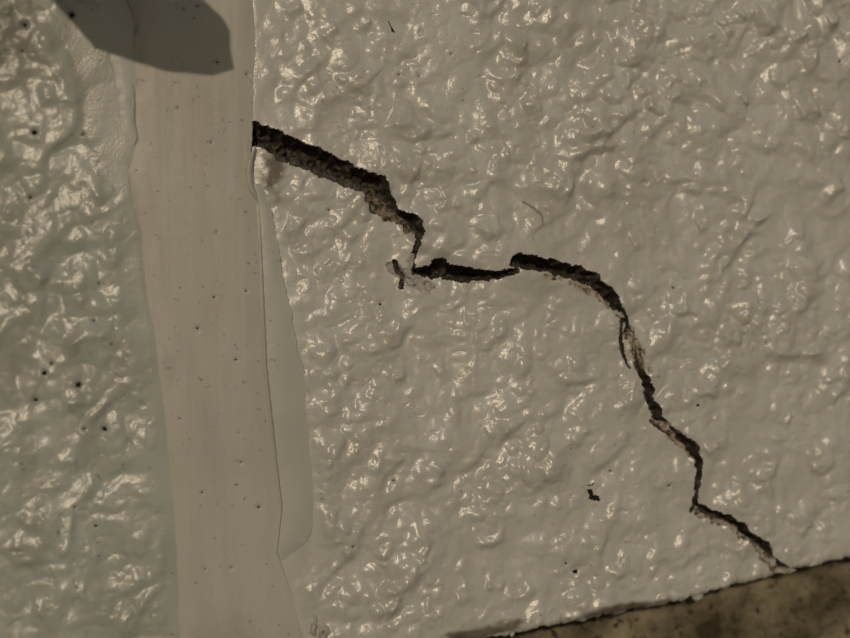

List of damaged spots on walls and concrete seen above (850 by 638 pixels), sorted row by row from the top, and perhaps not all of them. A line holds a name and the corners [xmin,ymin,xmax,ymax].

crack [252,121,796,575]